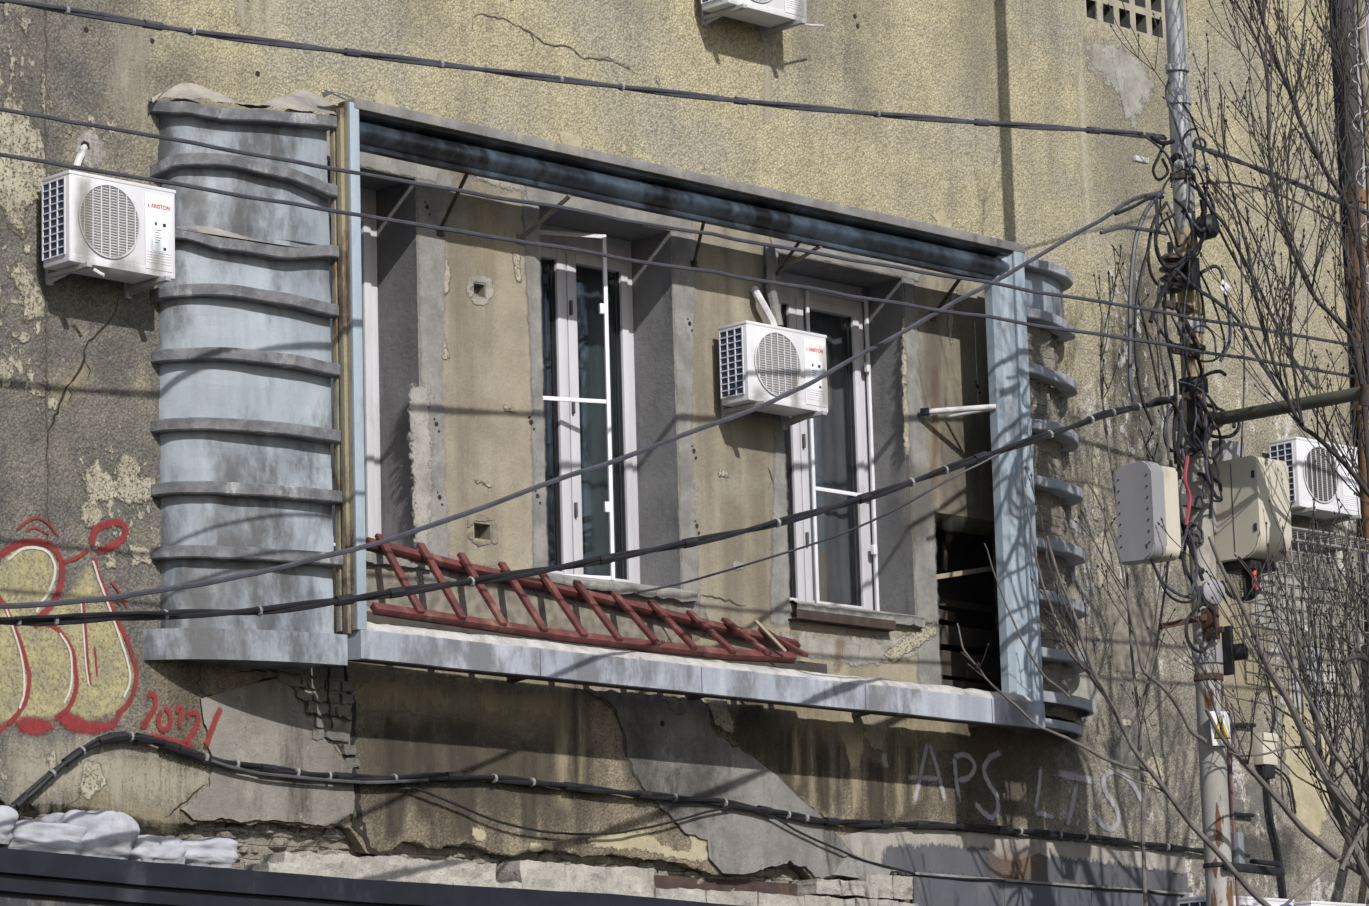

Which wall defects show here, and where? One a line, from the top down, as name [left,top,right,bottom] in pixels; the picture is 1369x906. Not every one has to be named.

crack [42,0,50,177]
crack [472,13,637,74]
peeling [0,4,155,412]
corrosion [1346,189,1369,387]
crack [44,285,118,566]
peeling [68,430,159,579]
spalling [275,665,360,769]
flaking render [0,743,801,891]
damp [355,672,590,839]
damp [733,704,1084,822]
corrosion [1204,684,1224,711]
corrosion [1211,797,1233,906]